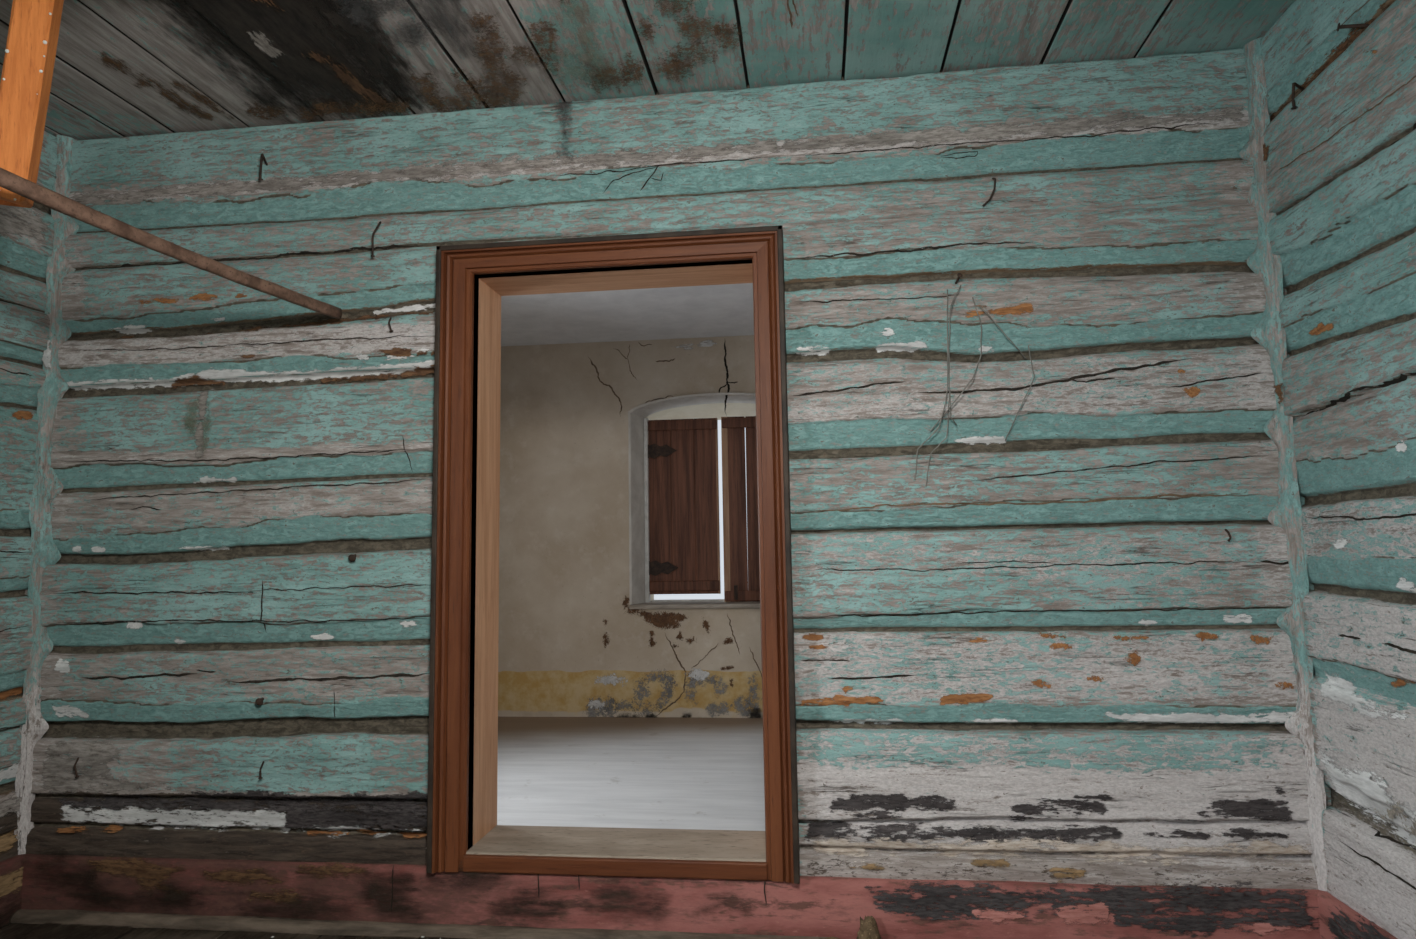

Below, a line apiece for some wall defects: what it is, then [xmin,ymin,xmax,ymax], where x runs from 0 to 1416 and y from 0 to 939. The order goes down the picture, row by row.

damp [97,0,562,122]
damp [588,0,748,94]
crack [588,342,674,412]
crack [719,342,737,416]
flaking render [622,596,734,648]
crack [657,615,762,716]
peeling [940,692,1018,724]
peeling [1105,711,1295,724]
peeling [1196,614,1274,645]
peeling [39,736,428,839]
peeling [1318,745,1416,848]
peeling [804,786,1389,939]